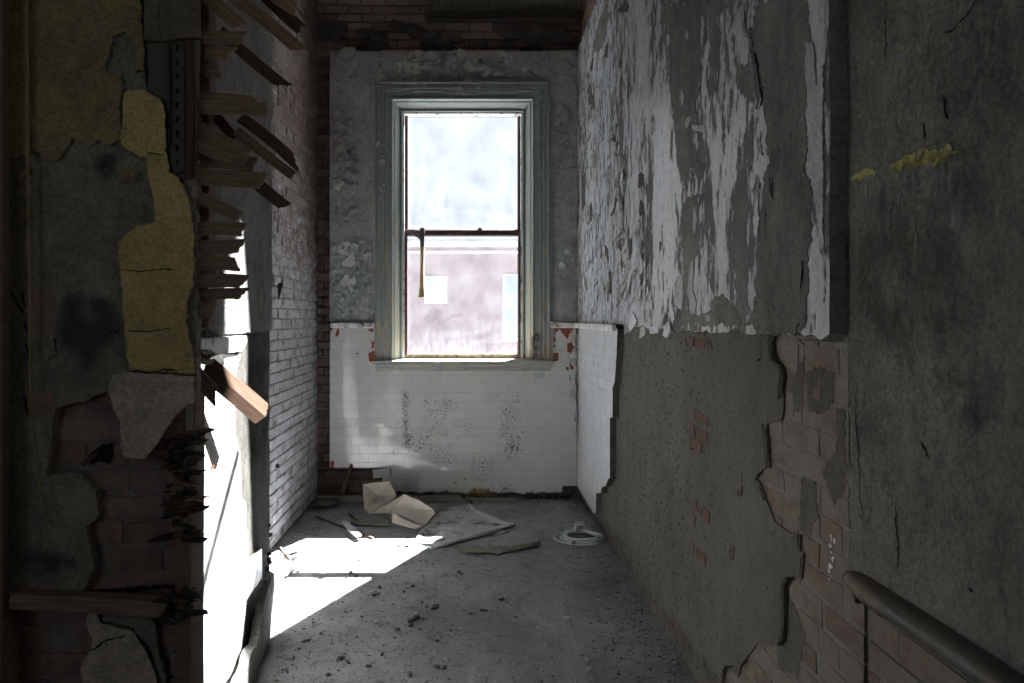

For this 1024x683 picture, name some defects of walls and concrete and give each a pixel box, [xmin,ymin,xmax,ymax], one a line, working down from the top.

crack [86,635,126,654]
flaking render [8,89,217,683]
peeling [316,0,882,683]
peeling [889,143,958,173]